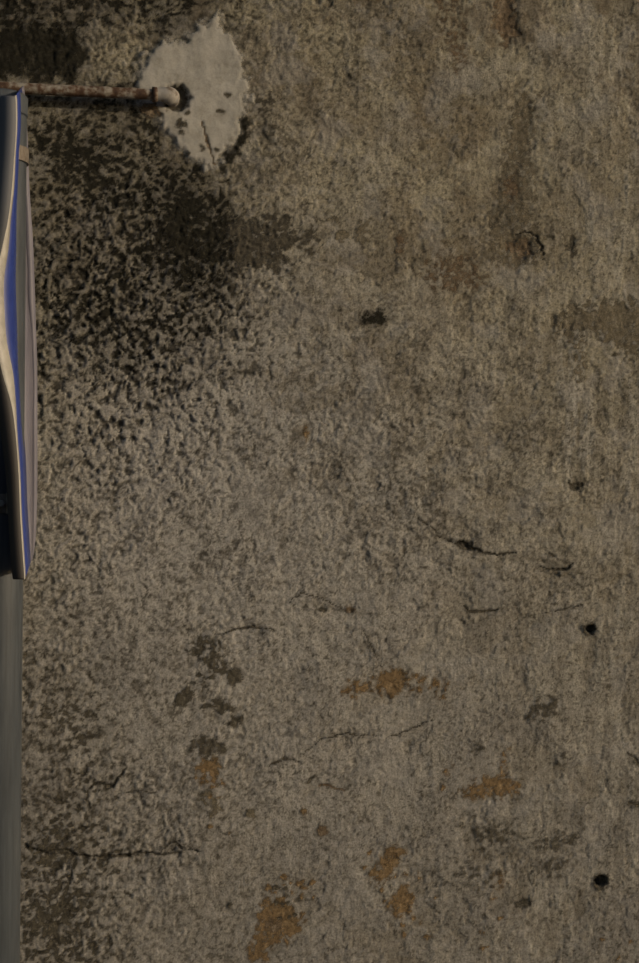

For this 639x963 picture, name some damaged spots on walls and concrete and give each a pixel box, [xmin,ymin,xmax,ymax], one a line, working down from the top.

damp [0,0,371,396]
crack [418,518,516,556]
crack [539,553,573,571]
rust [340,668,456,700]
crack [24,768,198,883]
rust [189,735,227,829]
rust [458,748,521,801]
rust [245,873,316,962]
rust [363,844,431,940]